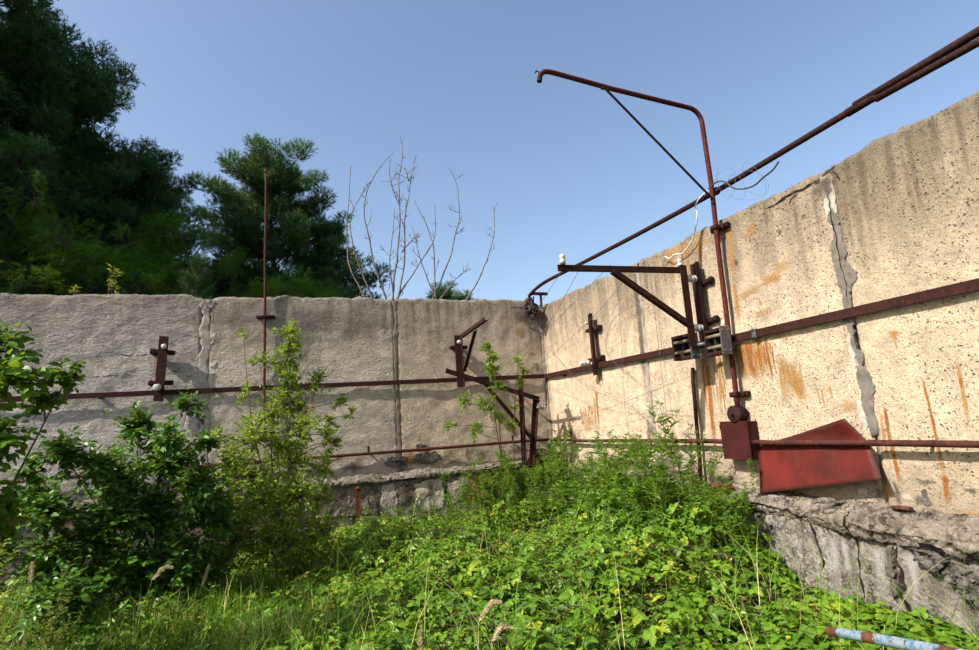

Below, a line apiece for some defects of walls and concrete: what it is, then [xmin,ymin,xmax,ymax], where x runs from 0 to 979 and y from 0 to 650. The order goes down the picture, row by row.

crack [766,166,840,209]
corrosion [732,262,785,315]
corrosion [581,376,600,427]
corrosion [701,356,726,445]
corrosion [734,335,832,402]
corrosion [880,408,899,476]
corrosion [923,383,943,465]
crack [843,509,865,599]
crack [885,546,911,615]